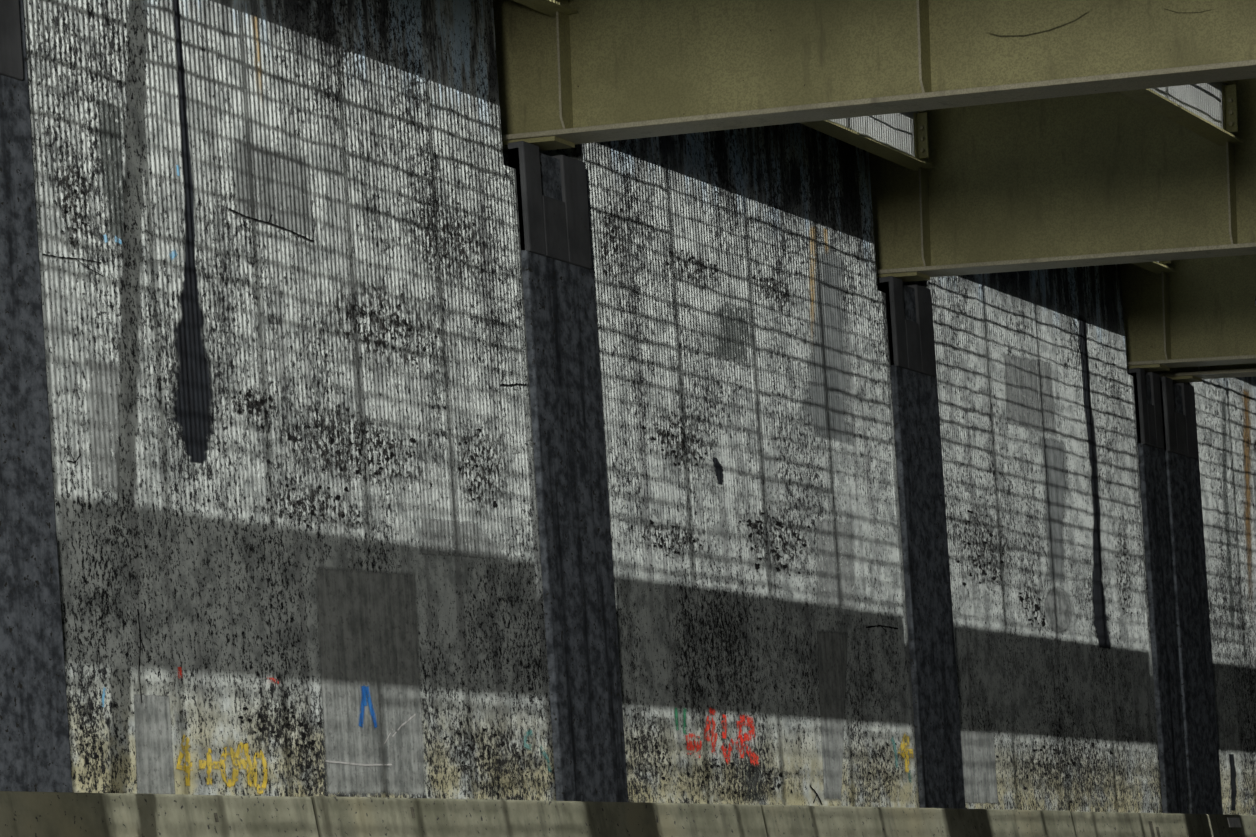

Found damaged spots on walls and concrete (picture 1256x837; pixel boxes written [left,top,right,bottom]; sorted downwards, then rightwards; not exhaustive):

rust [1243,390,1251,562]